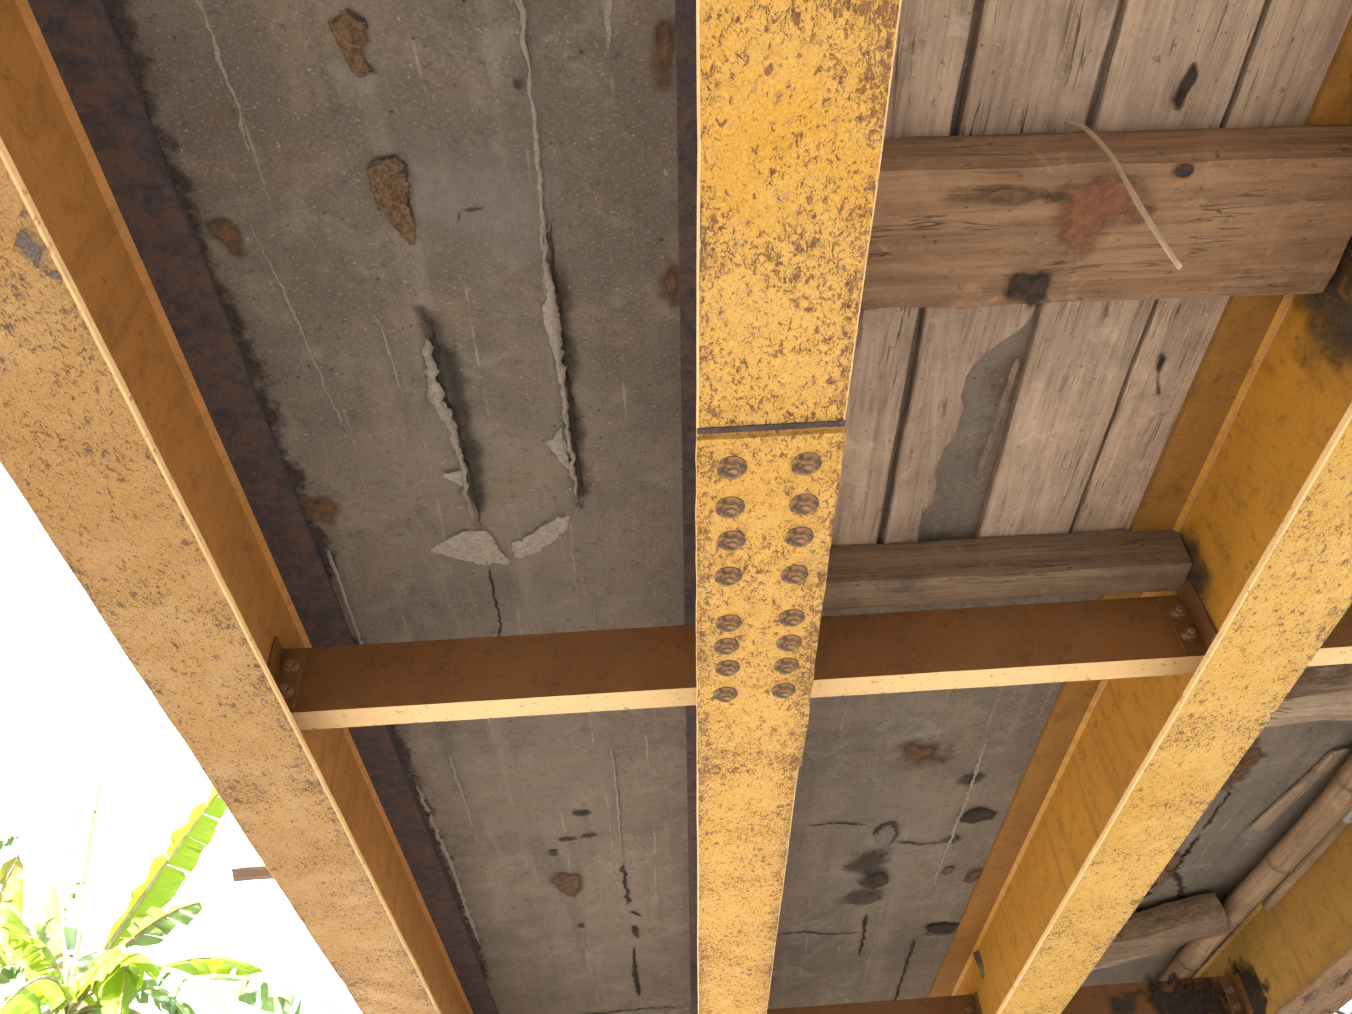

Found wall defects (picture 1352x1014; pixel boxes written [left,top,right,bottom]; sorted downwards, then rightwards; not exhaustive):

spalling [328,9,373,77]
crack [514,0,547,251]
spalling [367,154,416,245]
crack [458,207,484,221]